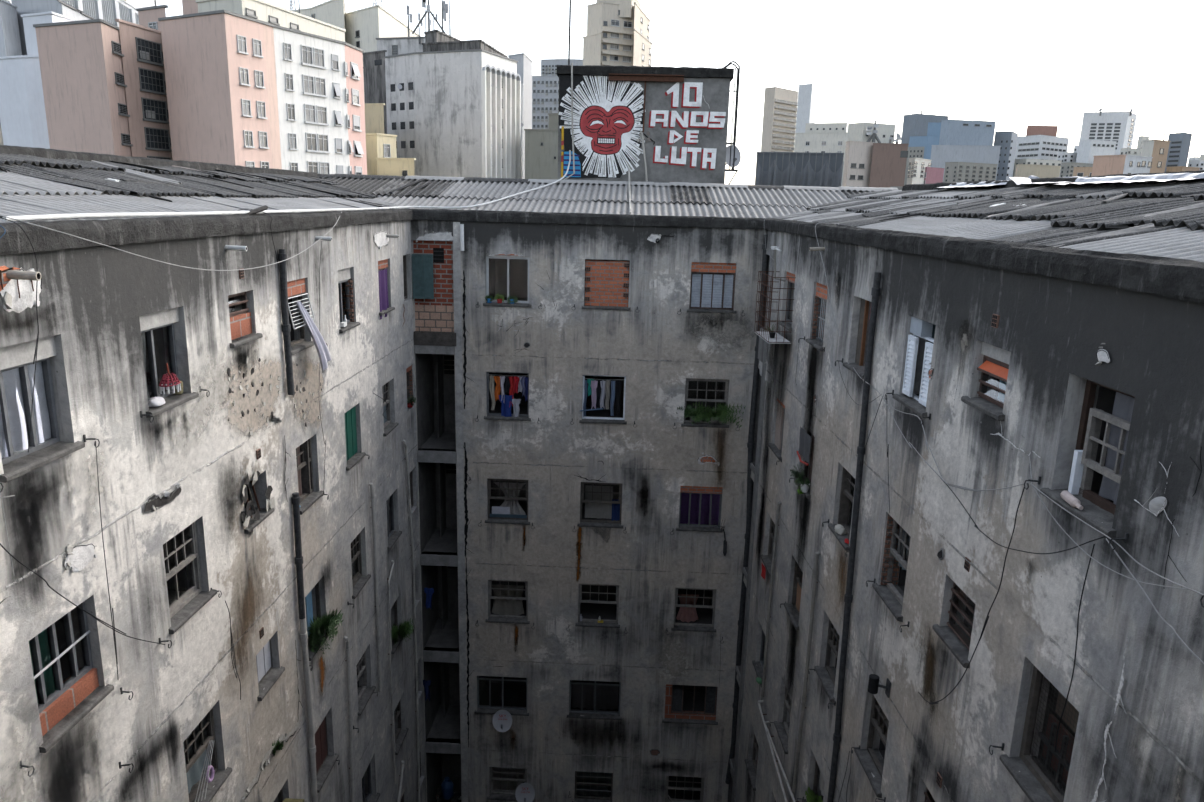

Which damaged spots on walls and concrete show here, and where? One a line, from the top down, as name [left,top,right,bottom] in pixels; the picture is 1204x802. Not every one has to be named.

crack [461,270,471,409]
peeling [223,357,323,436]
crack [463,442,503,747]
damp [923,633,934,710]
damp [50,733,96,802]